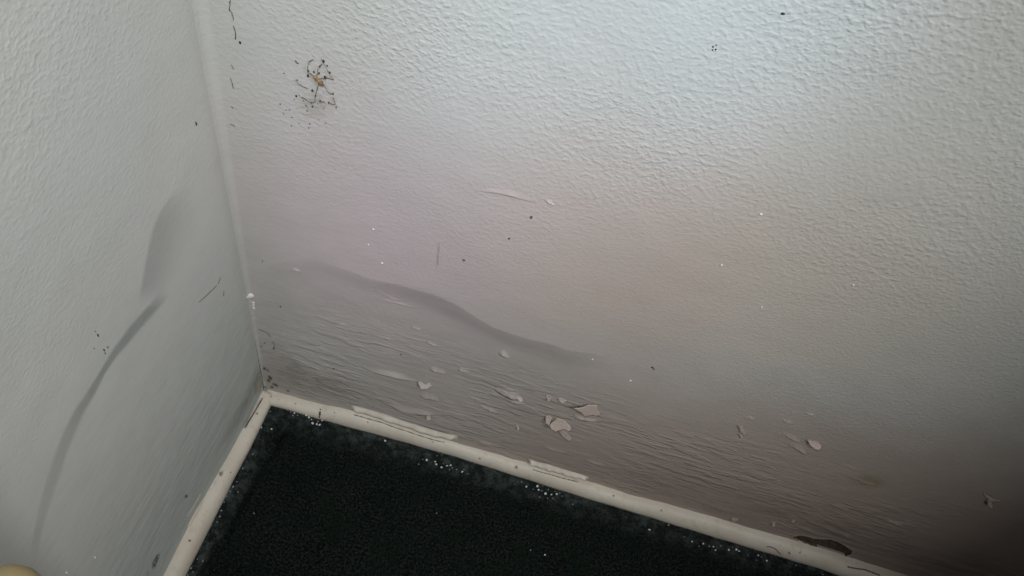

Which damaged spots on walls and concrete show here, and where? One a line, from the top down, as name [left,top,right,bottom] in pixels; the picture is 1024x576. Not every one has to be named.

peeling [350,404,458,440]
peeling [545,416,572,442]
spalling [790,519,856,560]